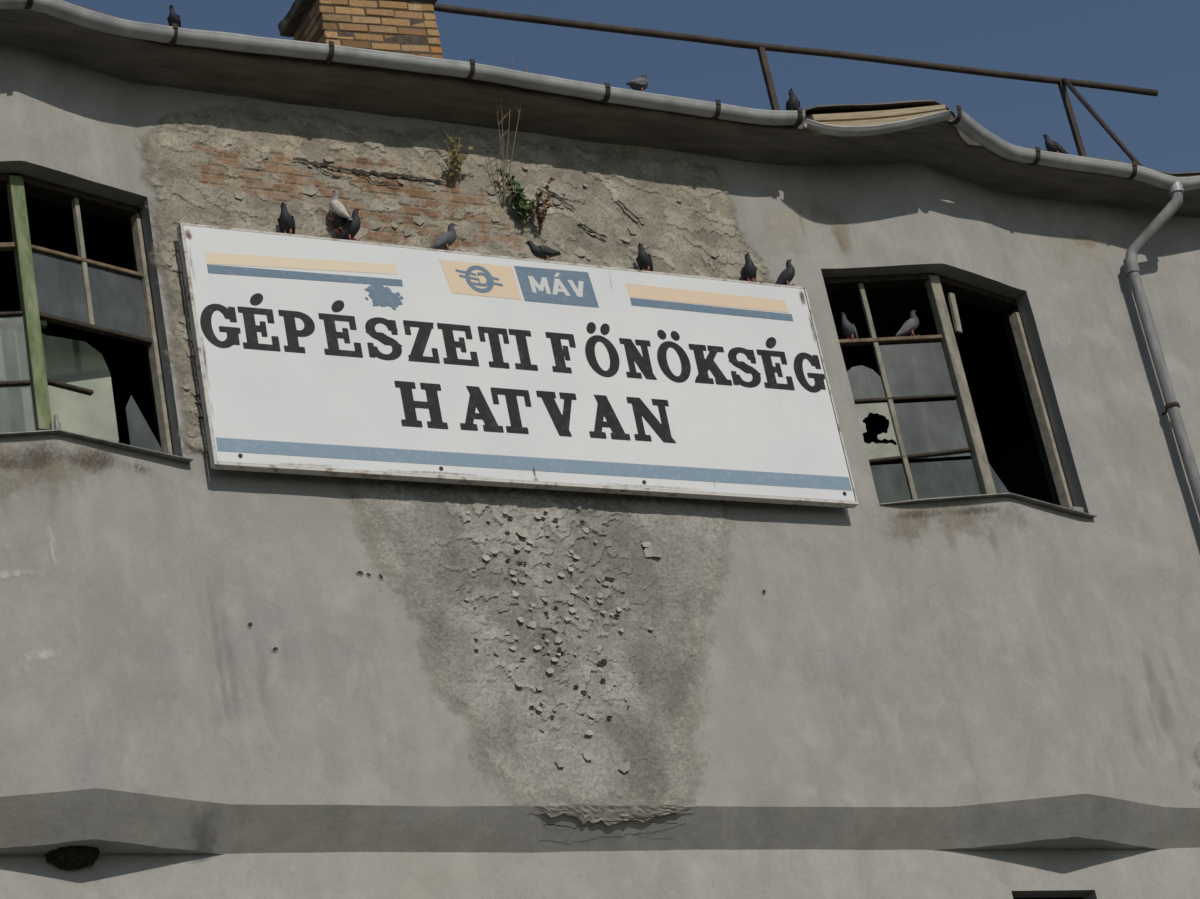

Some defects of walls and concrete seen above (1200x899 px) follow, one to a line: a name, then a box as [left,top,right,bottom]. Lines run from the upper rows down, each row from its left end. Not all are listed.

flaking render [142,108,775,458]
flaking render [344,477,730,826]
crack [540,808,691,829]